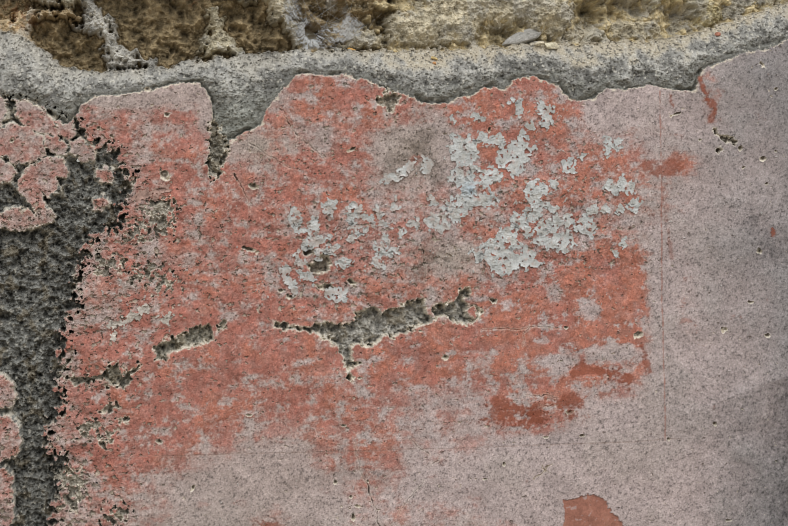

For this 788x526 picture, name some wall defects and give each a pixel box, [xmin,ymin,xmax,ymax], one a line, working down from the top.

spalling [376,87,402,113]
peeling [277,97,644,303]
spalling [0,92,231,526]
spalling [273,286,484,381]
crack [354,443,393,526]